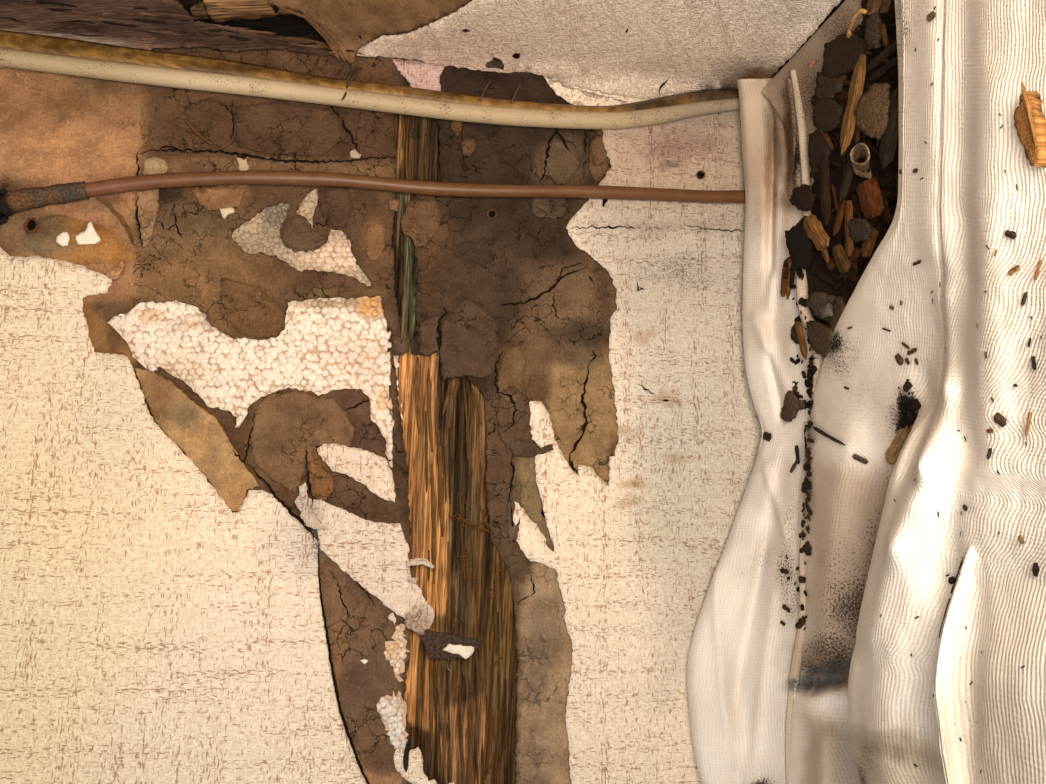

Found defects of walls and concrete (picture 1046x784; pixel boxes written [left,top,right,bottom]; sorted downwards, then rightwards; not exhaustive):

peeling [153,0,626,106]
peeling [0,67,397,193]
crack [135,101,396,245]
peeling [438,119,611,185]
crack [539,128,587,183]
crack [570,199,641,241]
crack [686,224,745,232]
crack [497,263,594,318]
peeling [0,184,619,784]
crack [494,351,517,543]
crack [569,351,619,474]
crack [234,411,375,784]